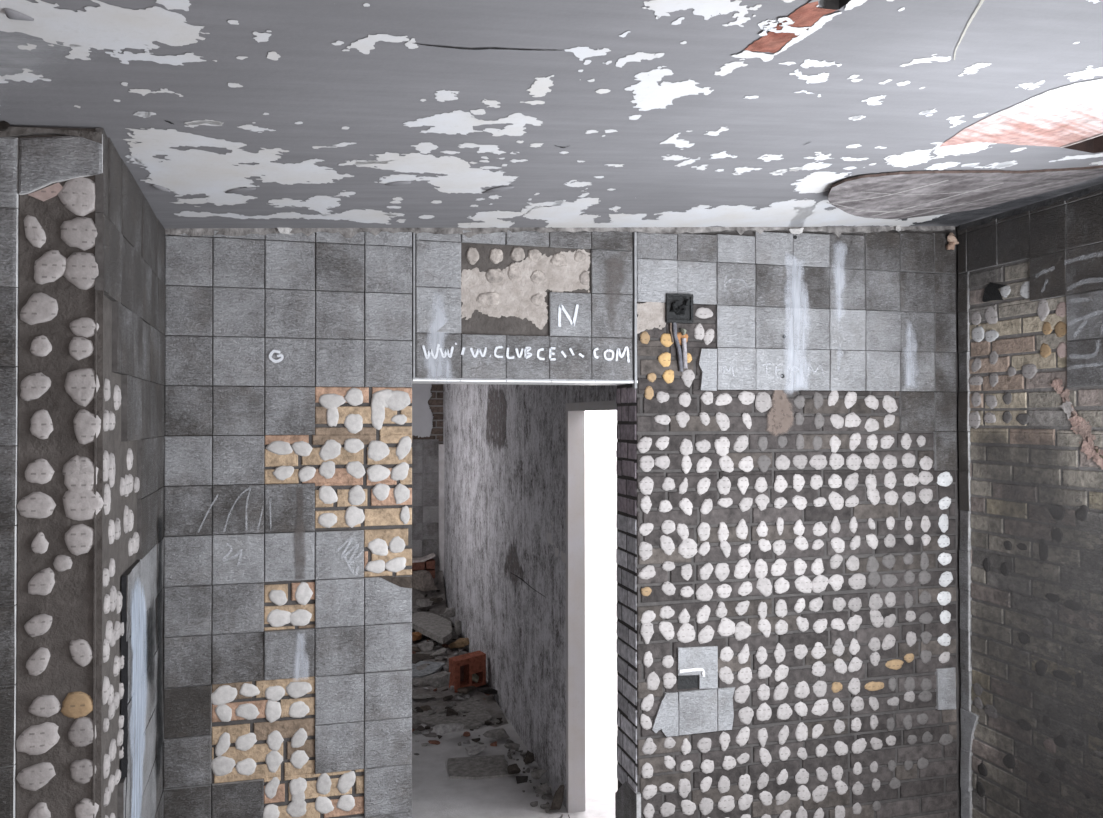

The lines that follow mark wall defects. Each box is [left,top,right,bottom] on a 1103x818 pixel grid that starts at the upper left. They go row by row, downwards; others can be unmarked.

peeling [0,0,217,65]
peeling [331,34,418,54]
crack [414,43,565,51]
peeling [564,47,714,120]
peeling [642,0,776,30]
peeling [779,59,842,97]
peeling [114,75,1027,228]
peeling [1049,132,1103,165]
peeling [461,243,591,336]
peeling [265,385,443,588]
peeling [264,582,315,631]
peeling [211,676,364,818]